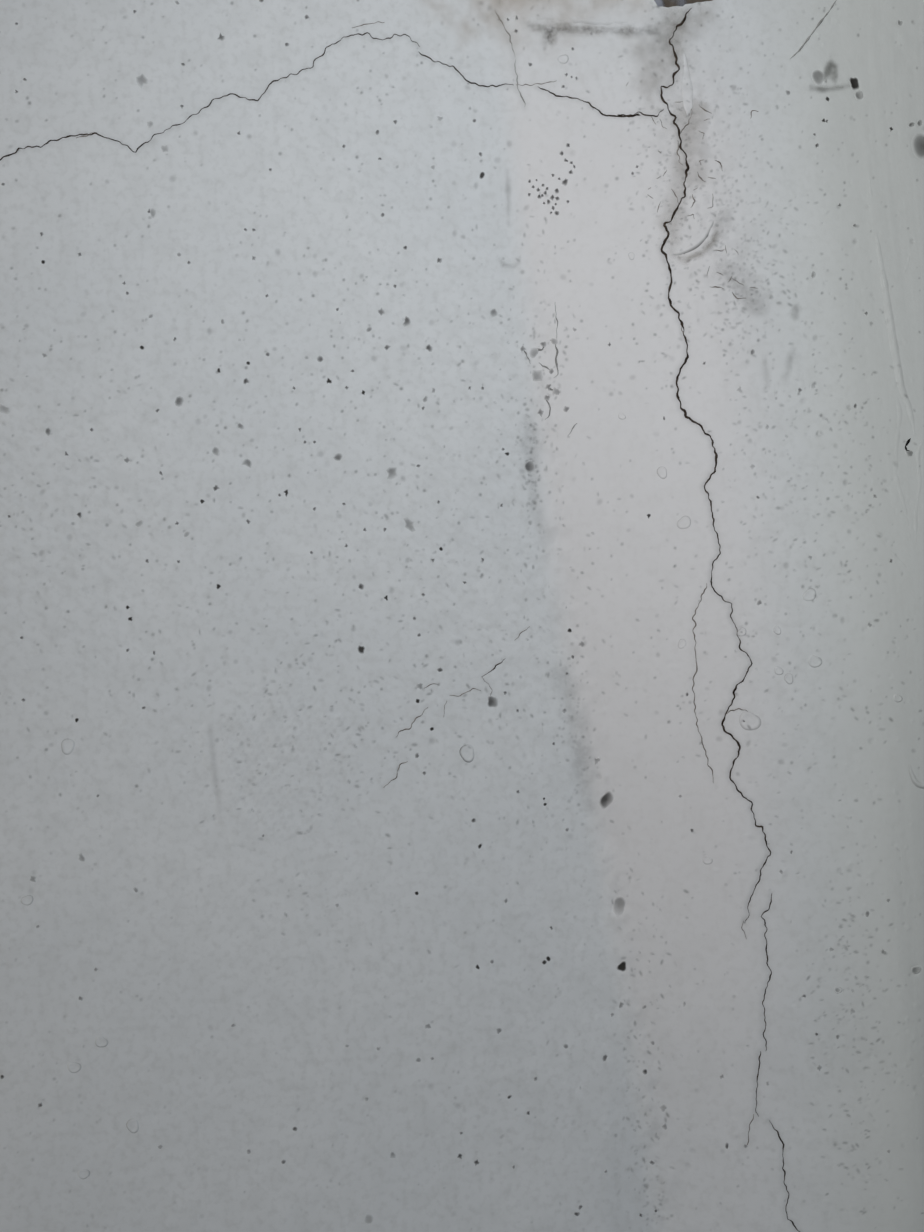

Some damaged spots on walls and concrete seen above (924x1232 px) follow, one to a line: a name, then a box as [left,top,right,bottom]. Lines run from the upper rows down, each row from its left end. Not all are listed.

crack [0,0,771,937]
crack [747,894,800,1232]